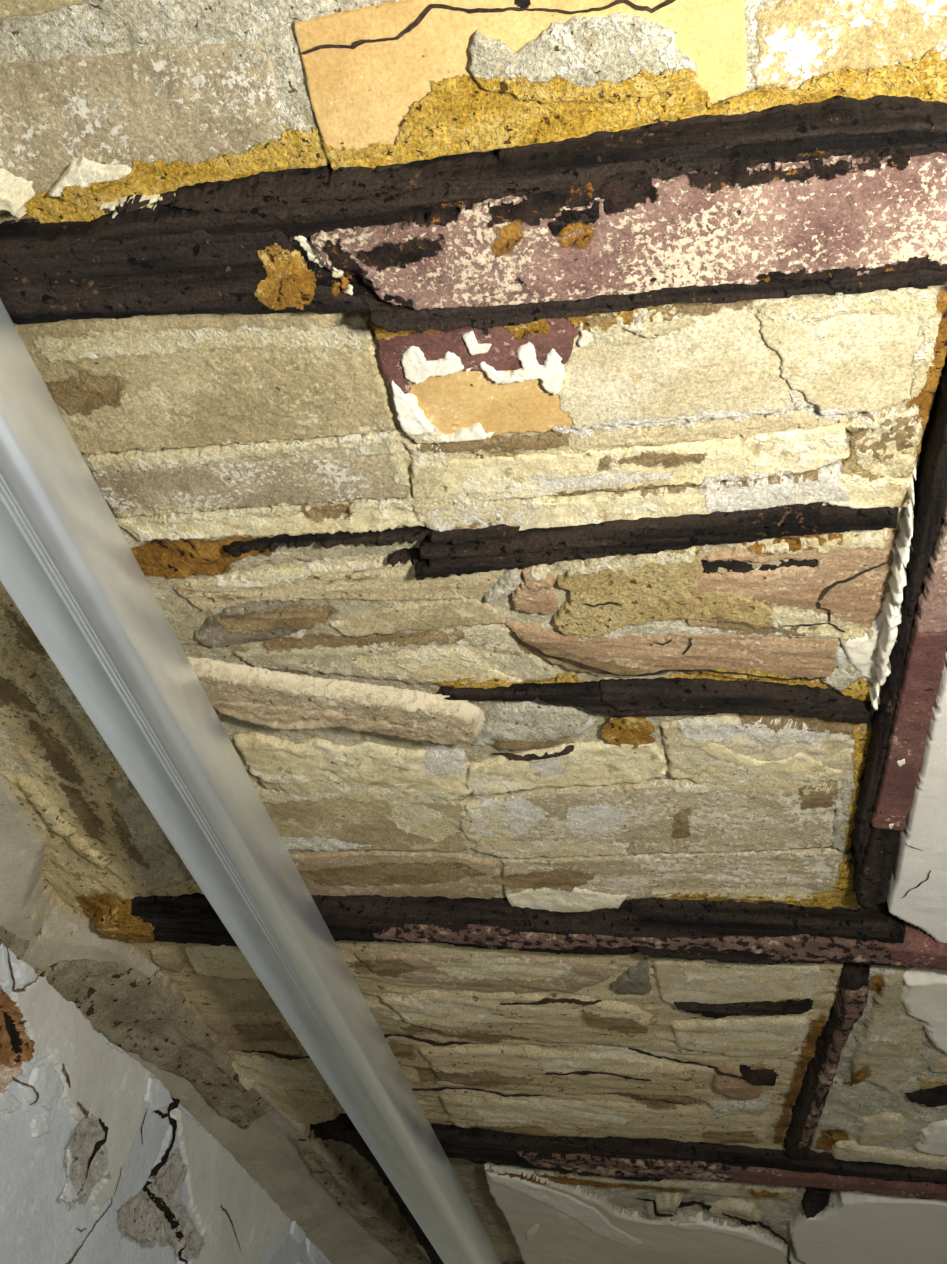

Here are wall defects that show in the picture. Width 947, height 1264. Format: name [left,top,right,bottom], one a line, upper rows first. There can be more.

spalling [0,0,947,224]
corrosion [0,49,947,342]
crack [300,0,676,55]
spalling [13,284,947,912]
corrosion [132,501,899,580]
corrosion [75,893,155,943]
spalling [0,581,346,1143]
crack [66,1097,188,1264]
flaking render [0,943,321,1264]
spalling [335,940,844,1150]
spalling [809,965,947,1170]